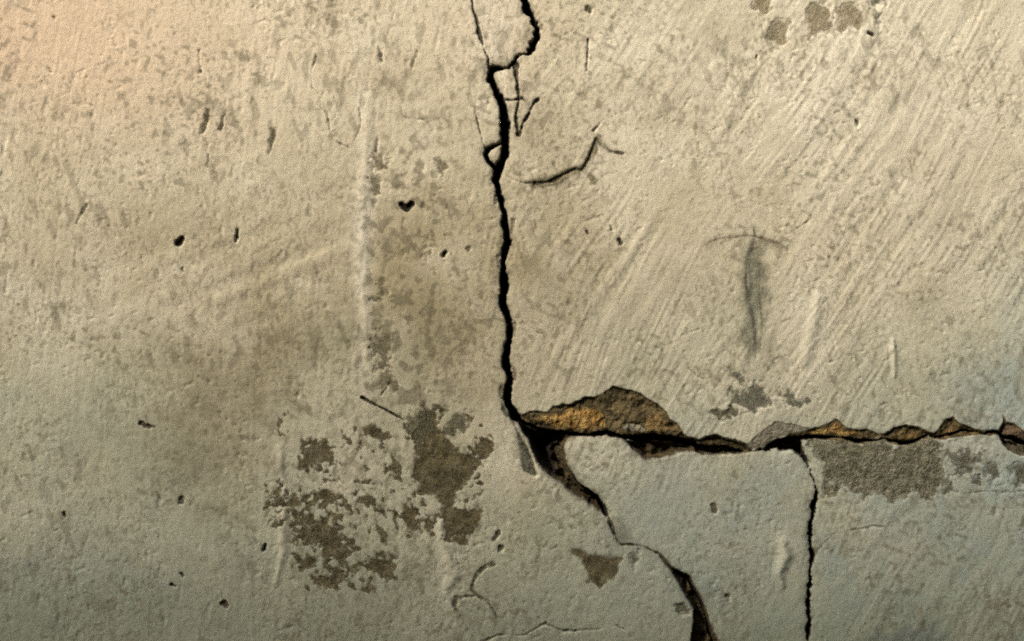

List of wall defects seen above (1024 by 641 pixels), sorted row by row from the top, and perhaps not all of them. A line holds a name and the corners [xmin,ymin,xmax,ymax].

crack [471,0,1024,641]
peeling [710,369,811,420]
peeling [503,386,1024,503]
crack [453,563,496,641]